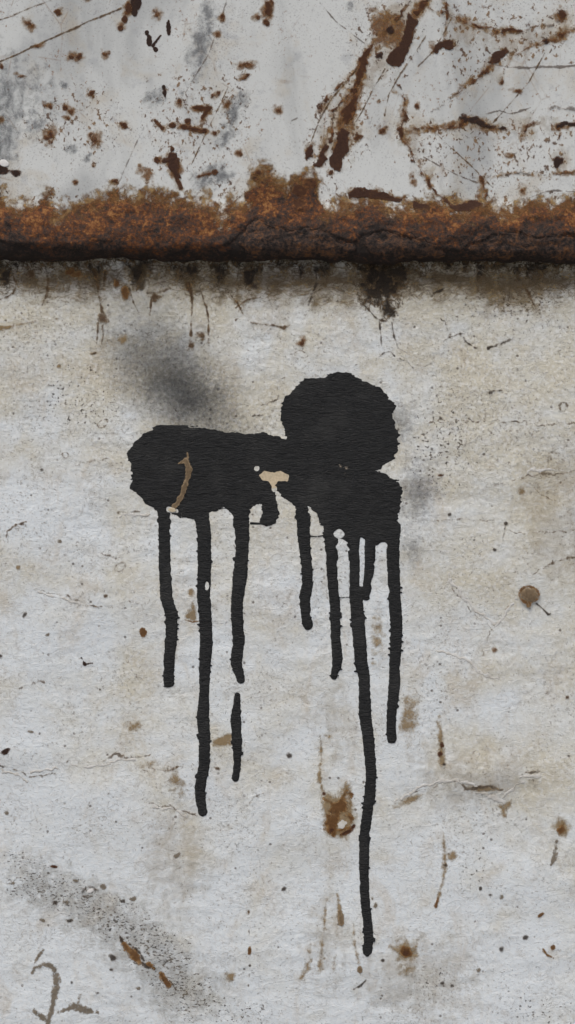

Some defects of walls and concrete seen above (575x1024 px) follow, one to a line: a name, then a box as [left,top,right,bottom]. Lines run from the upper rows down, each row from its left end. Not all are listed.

corrosion [252,0,274,26]
corrosion [430,2,523,54]
corrosion [238,61,255,80]
corrosion [43,103,75,144]
corrosion [88,132,101,148]
corrosion [154,91,231,135]
corrosion [405,113,507,134]
corrosion [550,105,575,137]
corrosion [0,146,575,348]
leakage [0,260,395,357]
leakage [395,262,575,328]
corrosion [317,736,355,838]